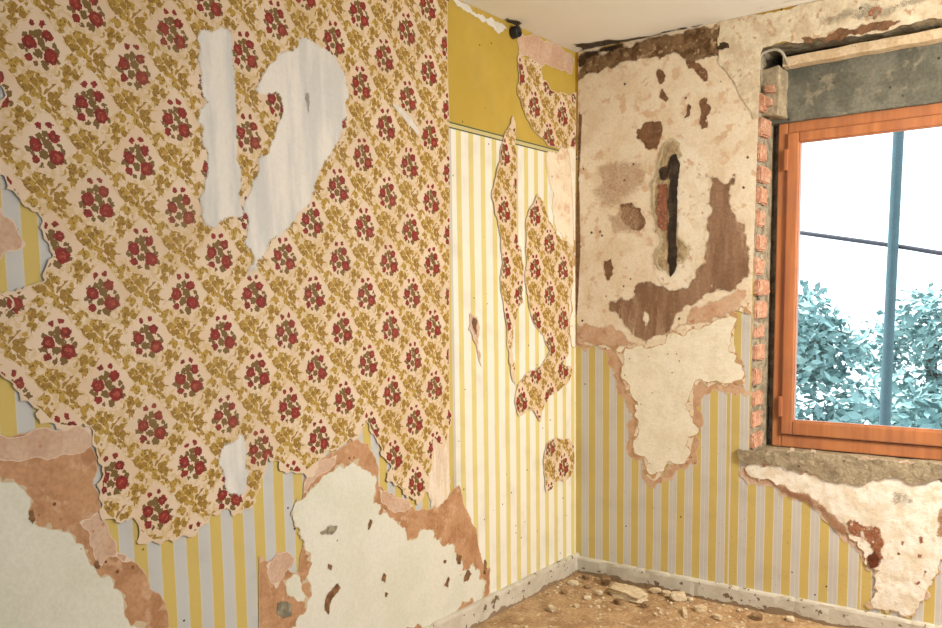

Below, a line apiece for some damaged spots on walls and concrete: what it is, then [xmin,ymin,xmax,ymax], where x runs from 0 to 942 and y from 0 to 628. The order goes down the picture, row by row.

peeling [0,207,26,259]
peeling [517,0,942,489]
peeling [0,426,169,628]
peeling [259,439,490,628]
spalling [740,463,942,618]